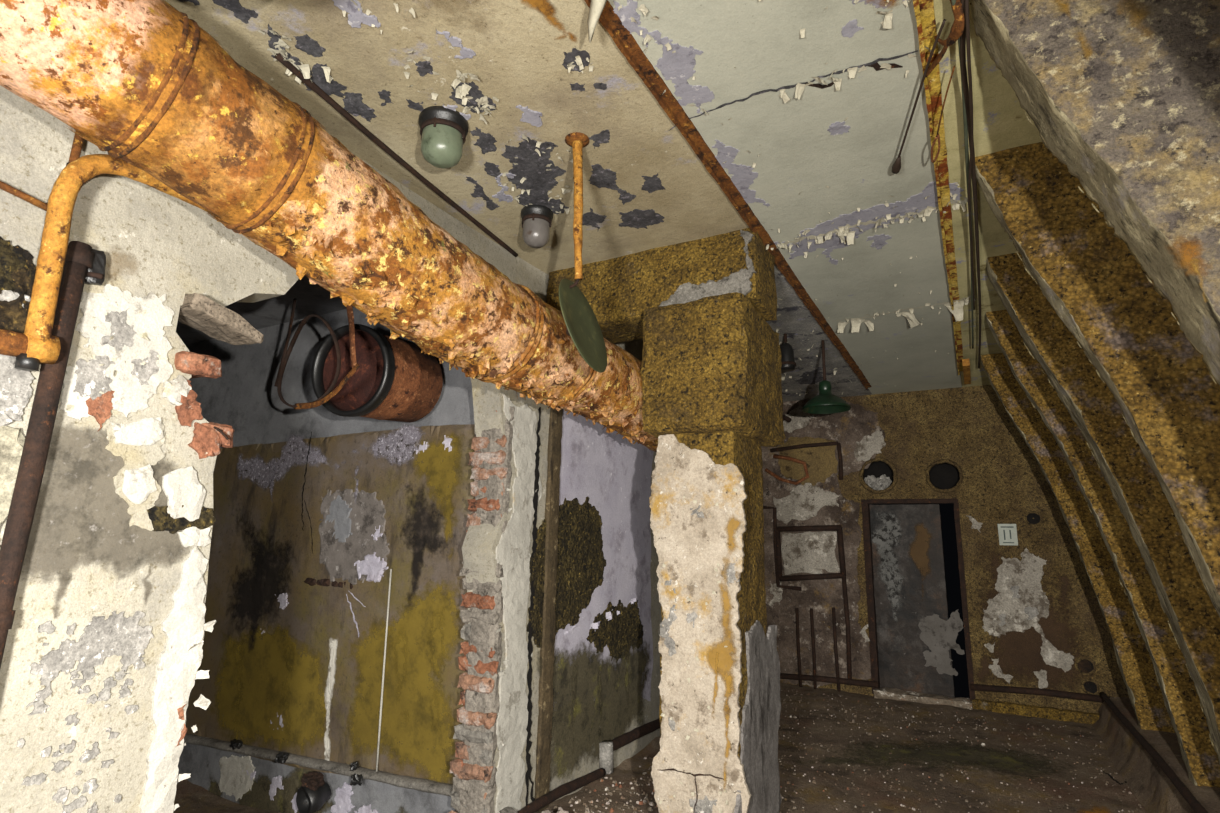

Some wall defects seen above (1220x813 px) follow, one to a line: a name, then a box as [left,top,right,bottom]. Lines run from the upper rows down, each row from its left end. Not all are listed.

peeling [178,0,665,230]
corrosion [522,0,575,41]
peeling [613,0,714,115]
crack [669,46,934,131]
flaking render [0,236,36,334]
flaking render [660,230,757,306]
peeling [766,181,978,265]
flaking render [0,354,35,426]
peeling [773,329,840,524]
peeling [854,430,886,462]
corrosion [708,517,740,787]
peeling [983,548,1074,689]